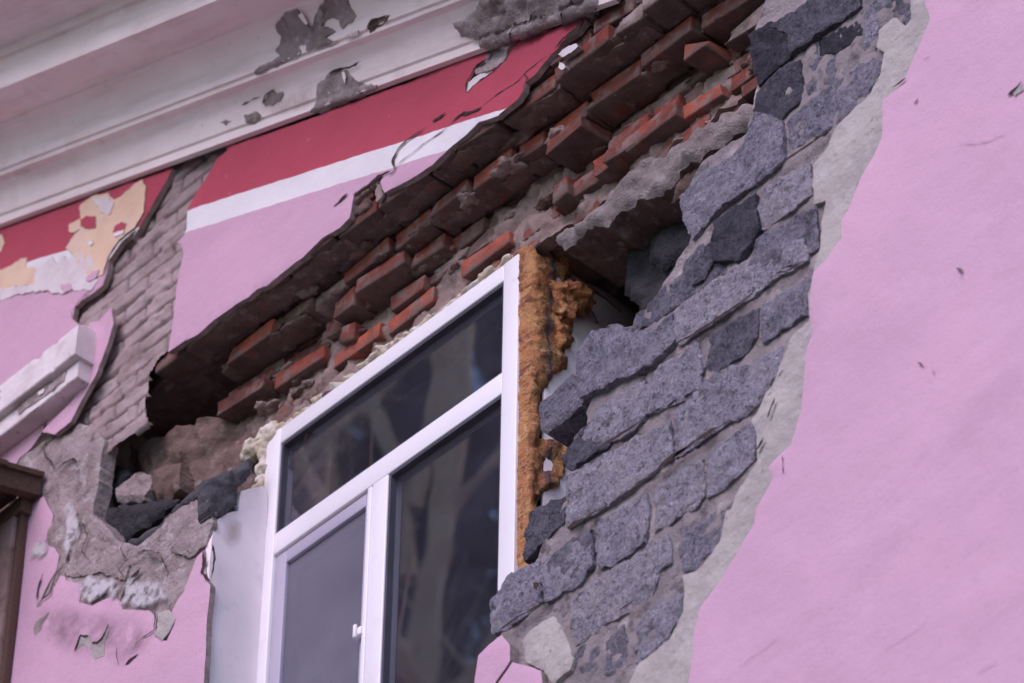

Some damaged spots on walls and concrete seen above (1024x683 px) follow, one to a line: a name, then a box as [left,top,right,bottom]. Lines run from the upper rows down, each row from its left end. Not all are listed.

spalling [254,0,390,74]
spalling [453,0,600,93]
spalling [242,89,284,124]
spalling [310,61,378,114]
crack [388,18,583,175]
spalling [353,171,389,216]
spalling [629,0,930,683]
spalling [0,143,259,642]
spalling [271,378,320,423]
spalling [74,623,111,659]